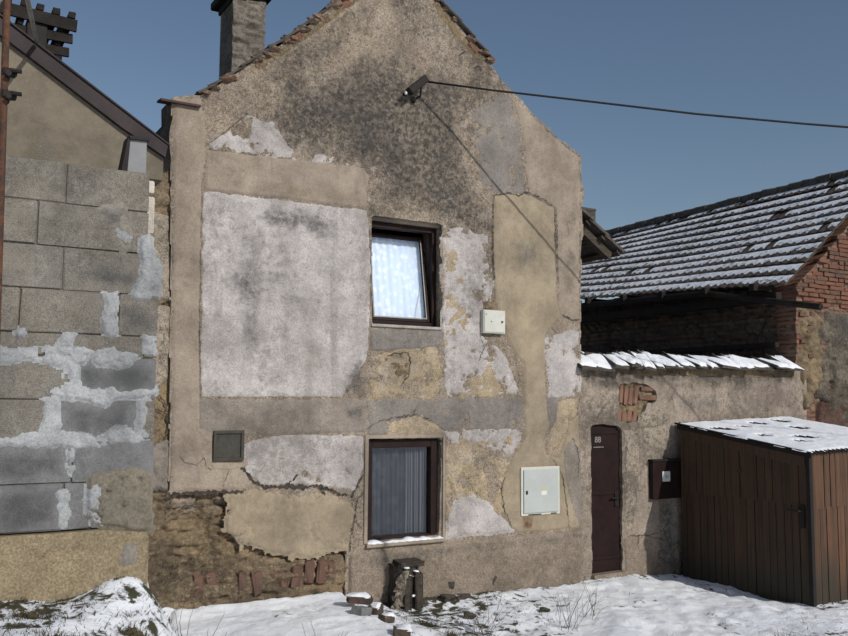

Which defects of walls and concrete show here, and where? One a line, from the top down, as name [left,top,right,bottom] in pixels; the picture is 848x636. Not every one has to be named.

peeling [209,115,296,160]
peeling [311,154,334,163]
peeling [369,225,522,401]
peeling [795,308,848,427]
peeling [153,439,169,491]
peeling [440,428,522,540]
peeling [618,382,674,536]